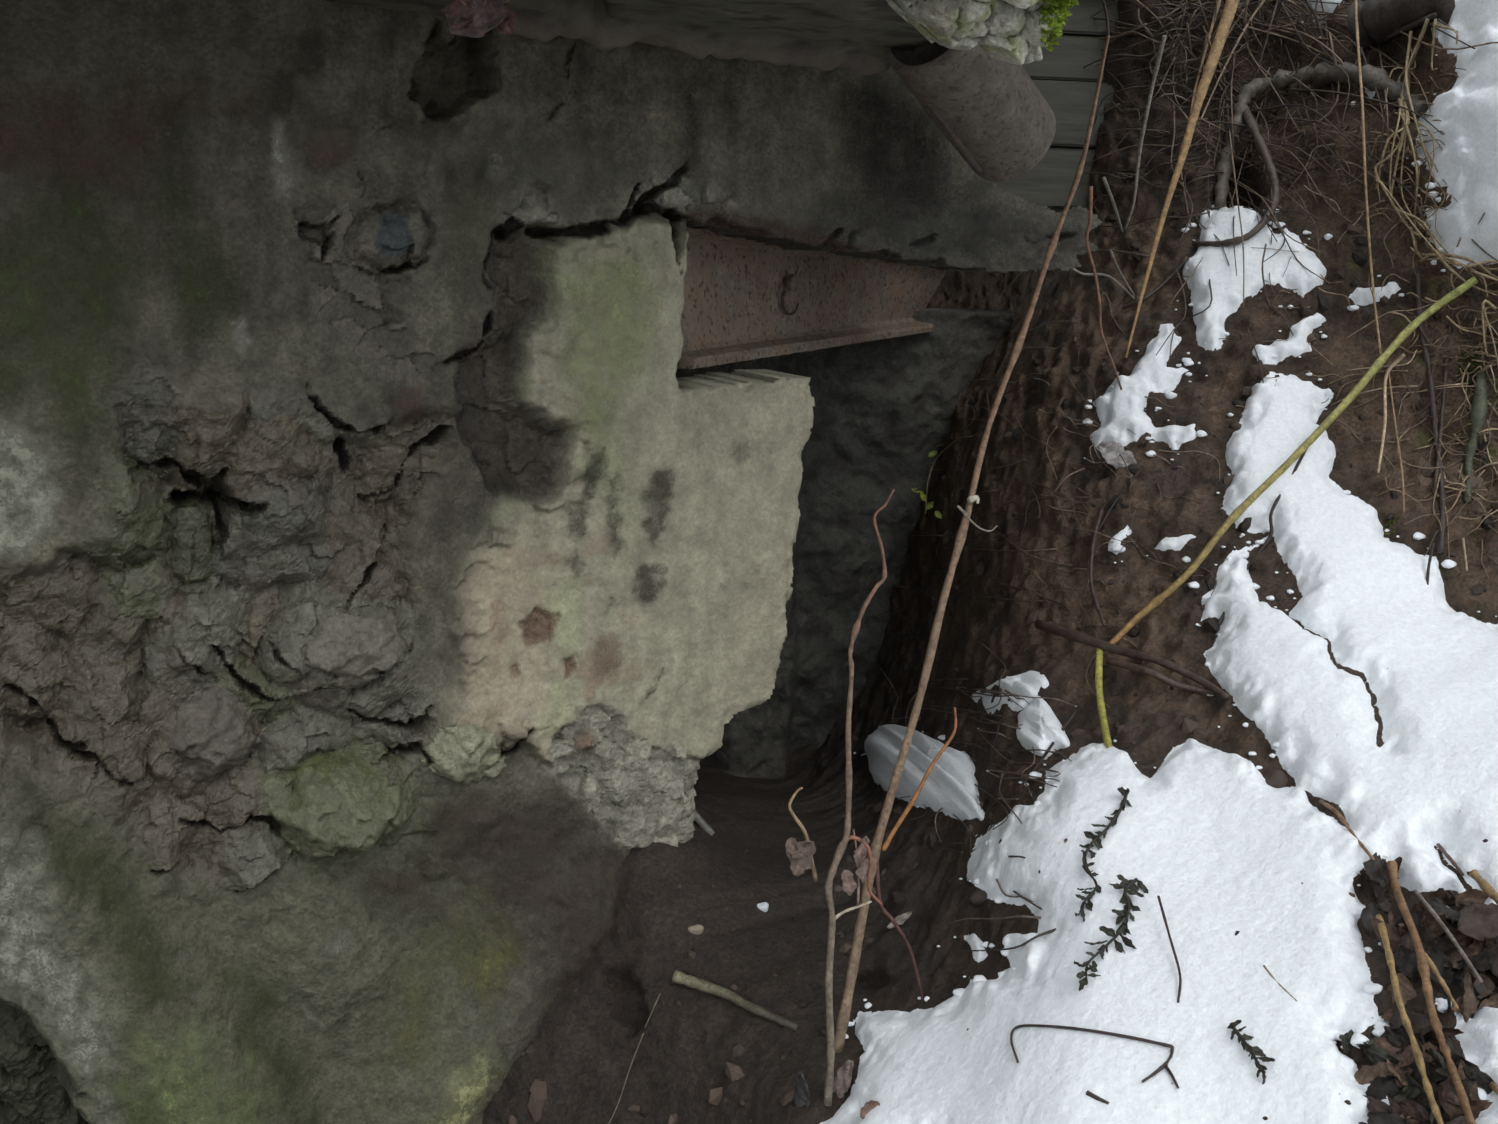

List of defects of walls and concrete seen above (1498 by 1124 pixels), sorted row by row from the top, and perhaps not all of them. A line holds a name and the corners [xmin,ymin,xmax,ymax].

crack [298,216,338,252]
crack [359,261,422,274]
crack [444,165,944,362]
spalling [0,178,571,898]
spalling [537,703,710,856]
efflorescence [0,843,108,1074]